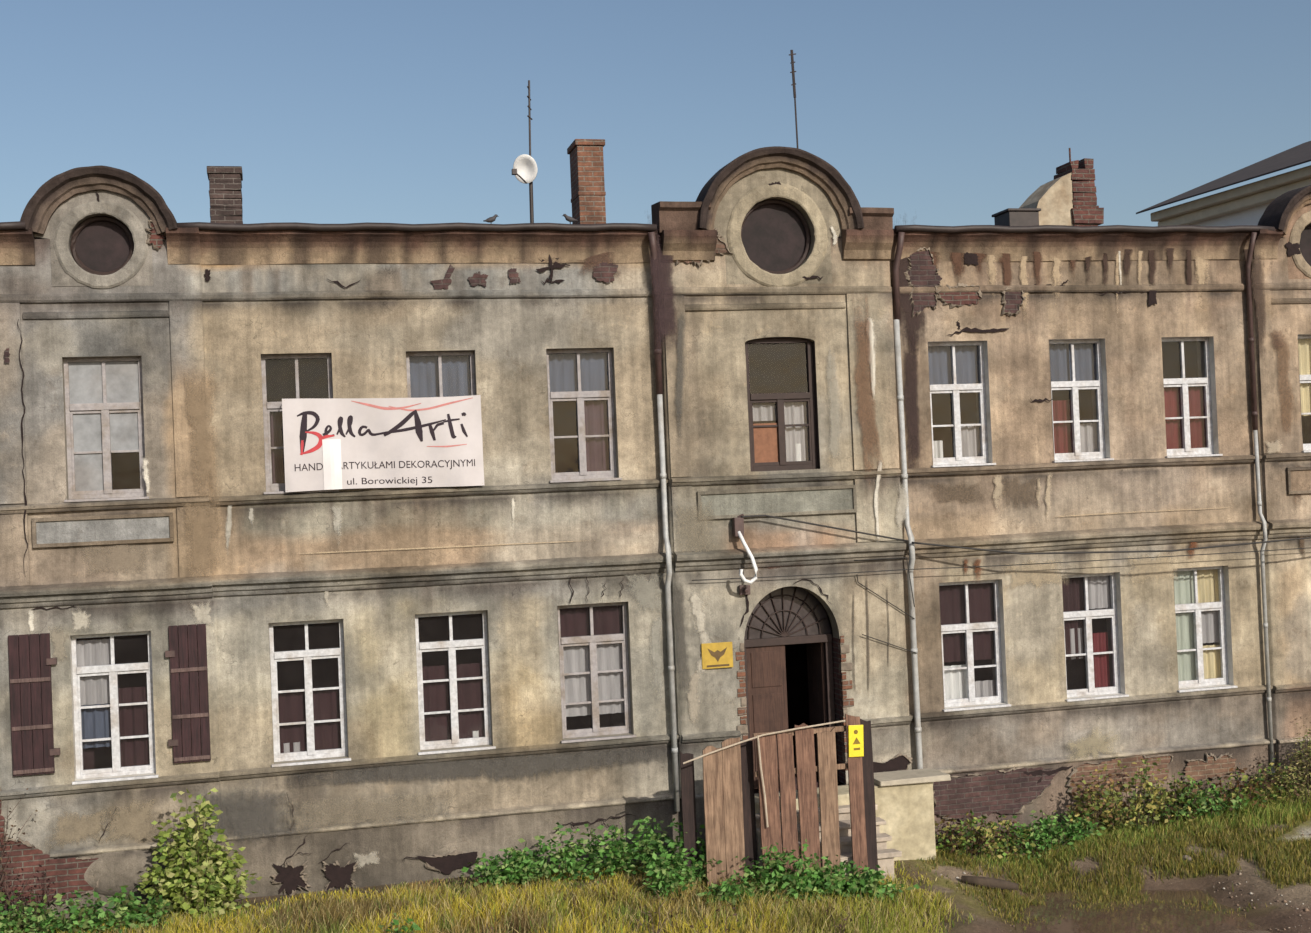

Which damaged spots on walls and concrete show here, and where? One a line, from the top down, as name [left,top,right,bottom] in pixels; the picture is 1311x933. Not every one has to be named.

spalling [430,264,455,290]
spalling [468,271,488,287]
spalling [904,247,982,318]
damp [988,255,996,285]
damp [1020,256,1029,308]
damp [1053,257,1061,286]
damp [1085,248,1208,297]
spalling [1001,287,1026,316]
spalling [933,752,1243,822]
spalling [0,788,99,907]
spalling [271,861,358,896]
spalling [417,850,477,874]